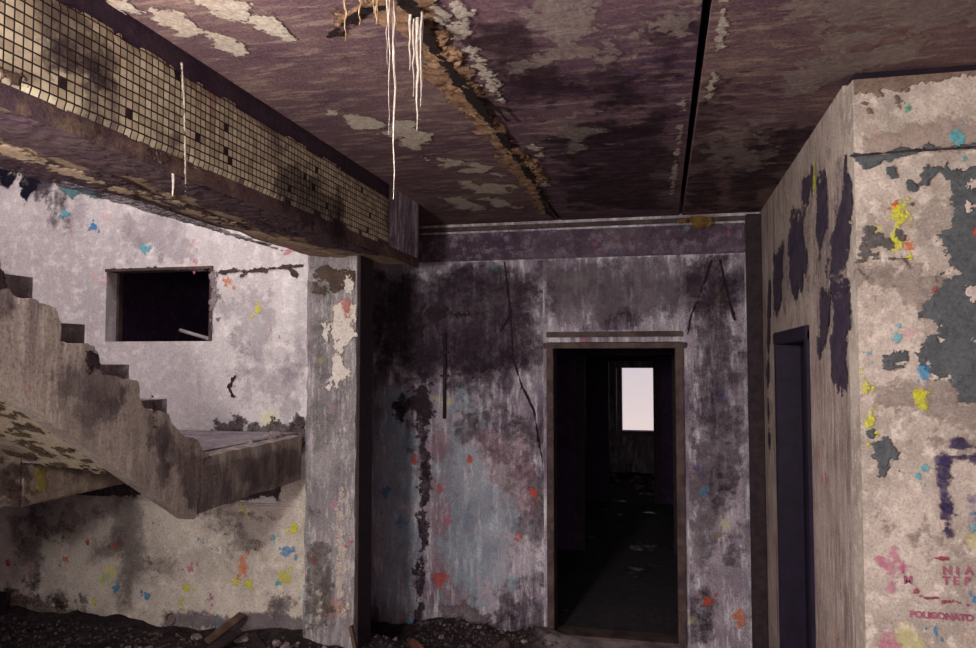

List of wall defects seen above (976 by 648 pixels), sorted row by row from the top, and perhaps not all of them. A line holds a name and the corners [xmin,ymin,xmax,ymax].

spalling [0,66,29,88]
peeling [0,398,105,474]
spalling [0,111,379,391]
peeling [107,0,297,57]
crack [110,264,303,278]
crack [410,302,434,623]
corrosion [322,0,553,215]
crack [326,0,555,219]
water stain [373,259,745,545]
peeling [766,142,976,450]
crack [850,146,976,157]
water stain [4,540,88,614]